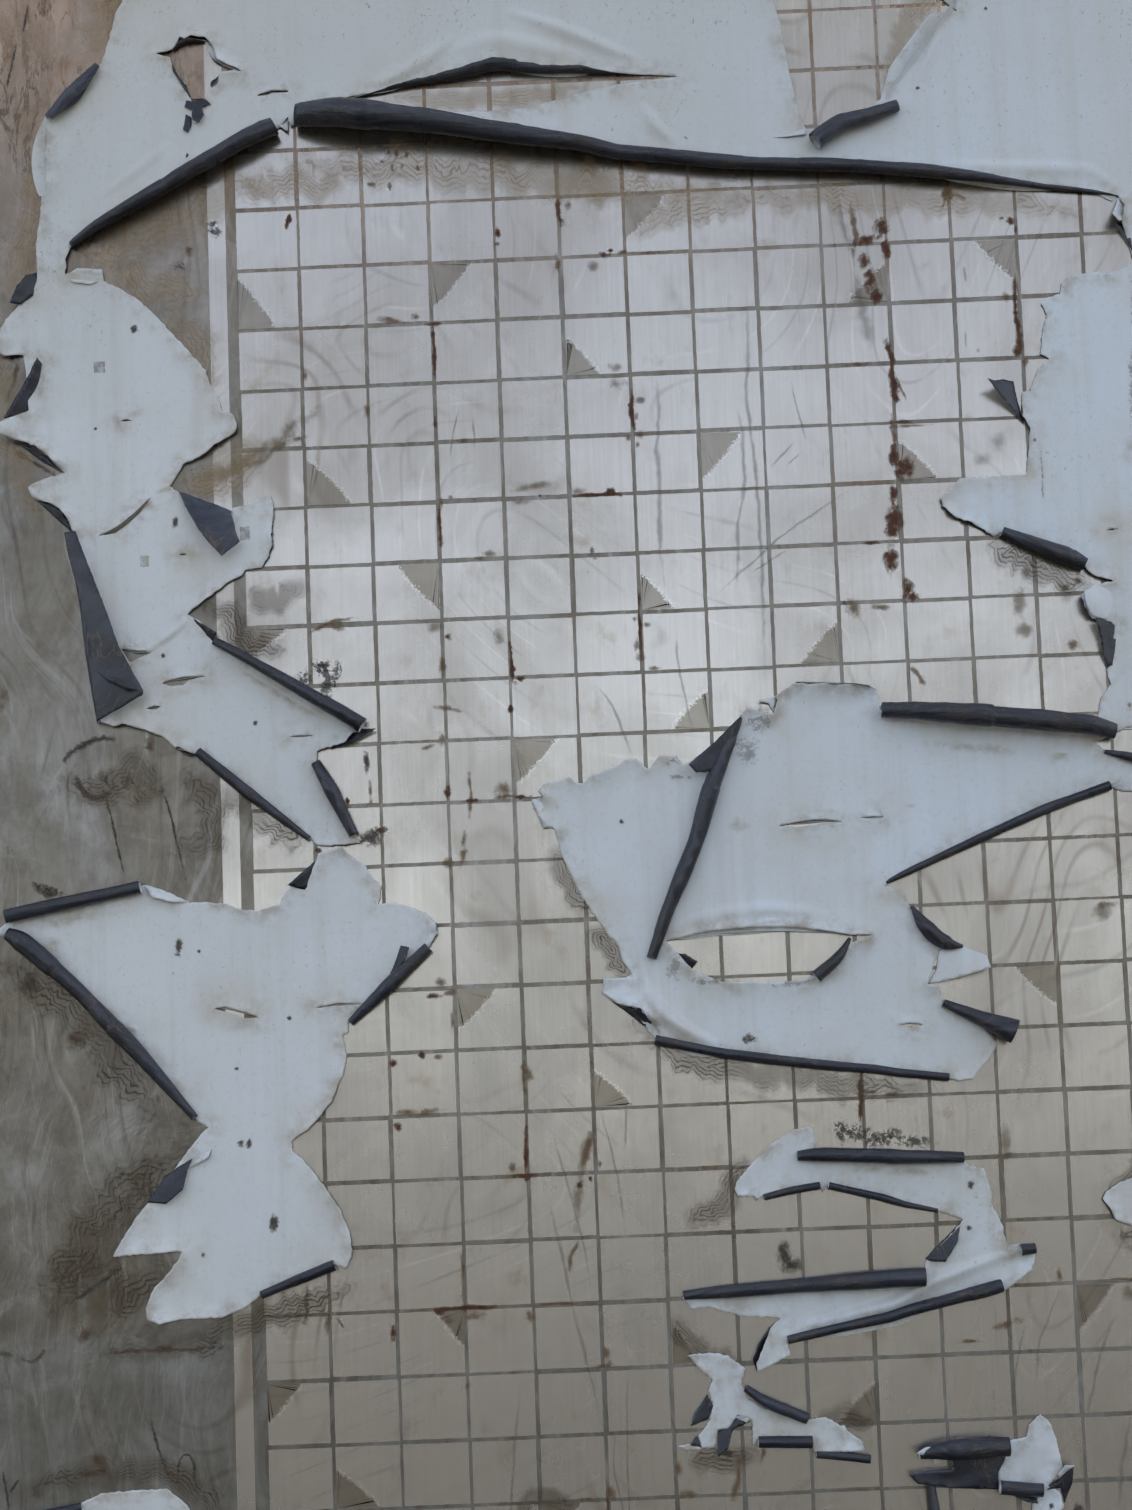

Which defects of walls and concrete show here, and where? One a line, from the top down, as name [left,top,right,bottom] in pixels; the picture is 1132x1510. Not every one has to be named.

peeling [69,0,1132,251]
corrosion [851,210,891,305]
corrosion [885,342,906,402]
corrosion [866,420,919,601]
peeling [38,501,143,724]
peeling [796,620,1132,762]
peeling [647,689,858,982]
peeling [886,781,1124,884]
peeling [0,619,437,1325]
peeling [610,1000,950,1081]
peeling [672,1127,1037,1464]
peeling [908,1415,1076,1510]